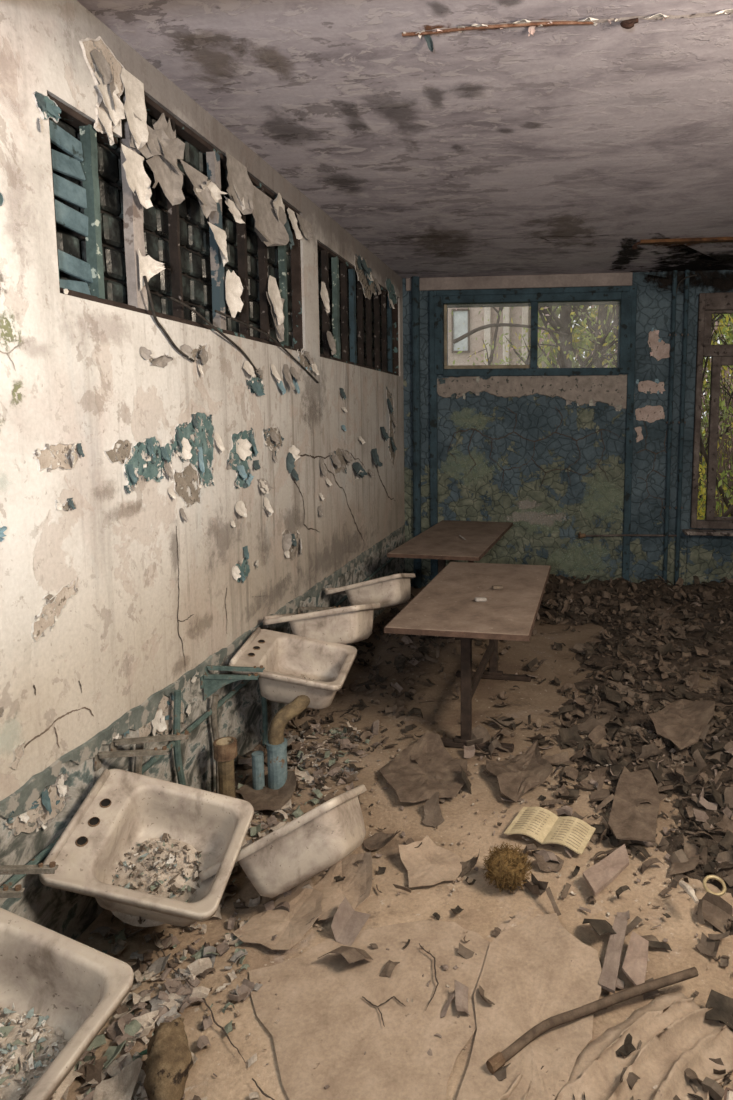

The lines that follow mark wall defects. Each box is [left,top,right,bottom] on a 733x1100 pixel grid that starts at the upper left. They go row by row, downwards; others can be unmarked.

peeling [32,91,61,133]
peeling [79,36,313,318]
leakage [611,238,643,270]
peeling [266,275,285,342]
peeling [320,281,330,313]
peeling [436,374,666,443]
peeling [32,443,85,472]
peeling [103,412,300,527]
peeling [318,386,398,516]
peeling [55,498,76,511]
peeling [31,577,78,642]
crack [24,681,94,748]